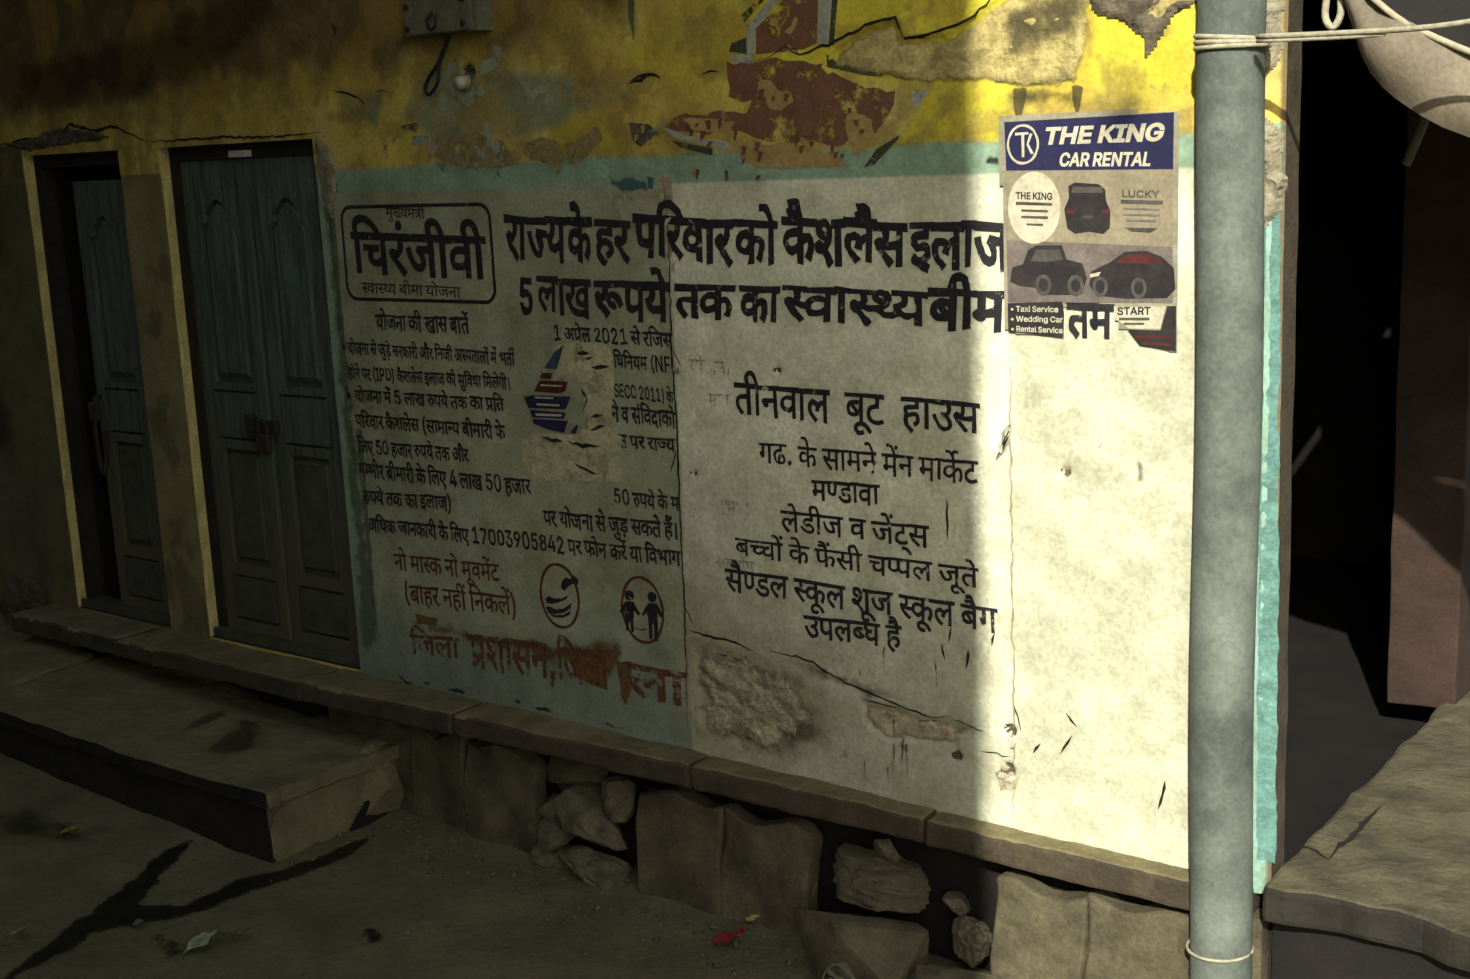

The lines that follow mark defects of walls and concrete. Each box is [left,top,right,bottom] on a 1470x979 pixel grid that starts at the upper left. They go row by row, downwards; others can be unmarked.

spalling [835,0,1196,87]
peeling [758,79,793,111]
peeling [428,127,604,179]
peeling [683,108,876,181]
crack [663,173,1021,826]
spalling [698,646,813,754]